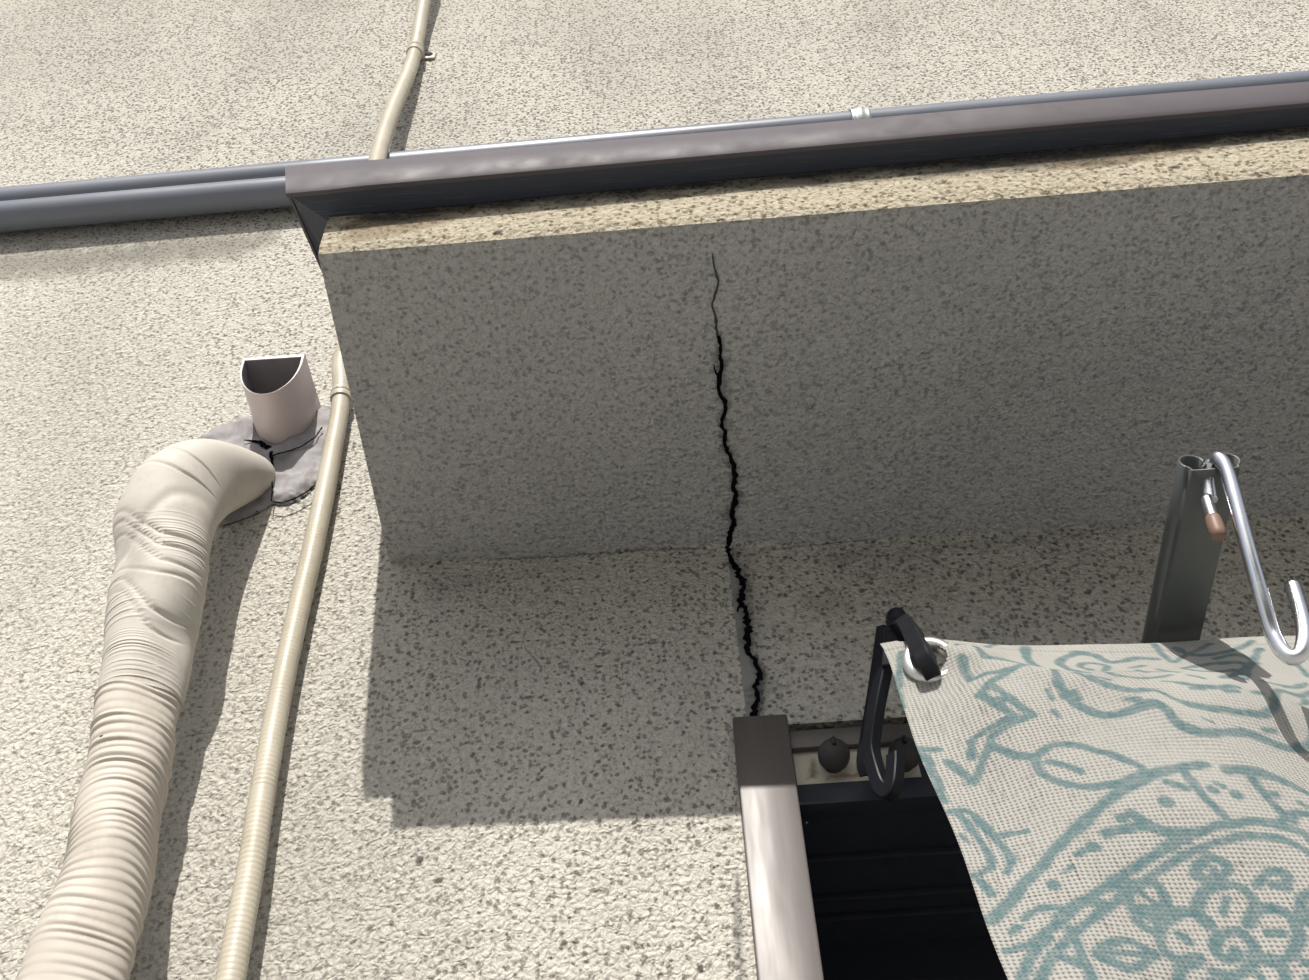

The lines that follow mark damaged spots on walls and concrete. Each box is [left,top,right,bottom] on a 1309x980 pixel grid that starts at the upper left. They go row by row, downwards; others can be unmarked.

crack [711,254,766,716]